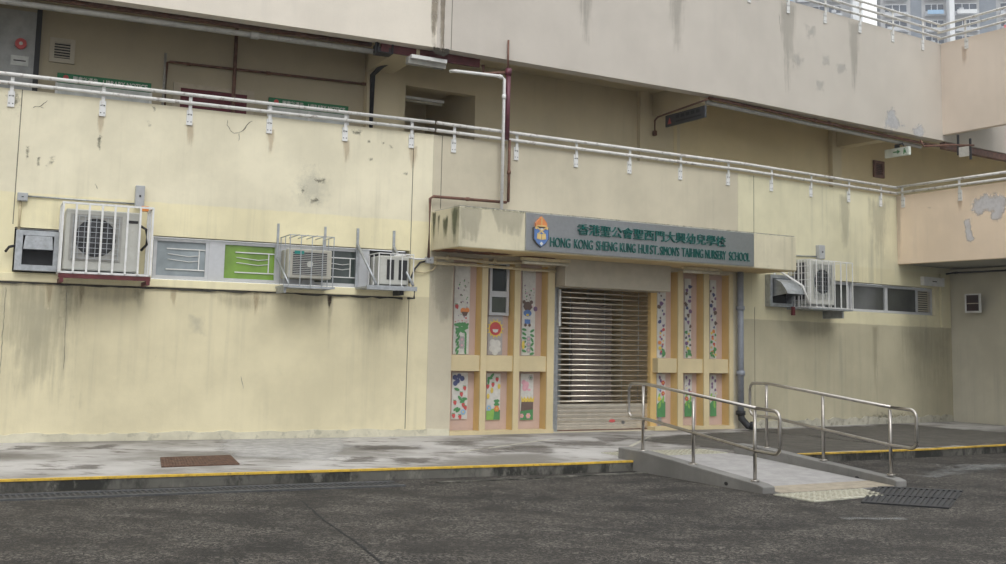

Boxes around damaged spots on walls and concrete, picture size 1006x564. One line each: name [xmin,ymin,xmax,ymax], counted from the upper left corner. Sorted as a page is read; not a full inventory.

leakage [432,0,446,49]
peeling [964,193,1006,241]